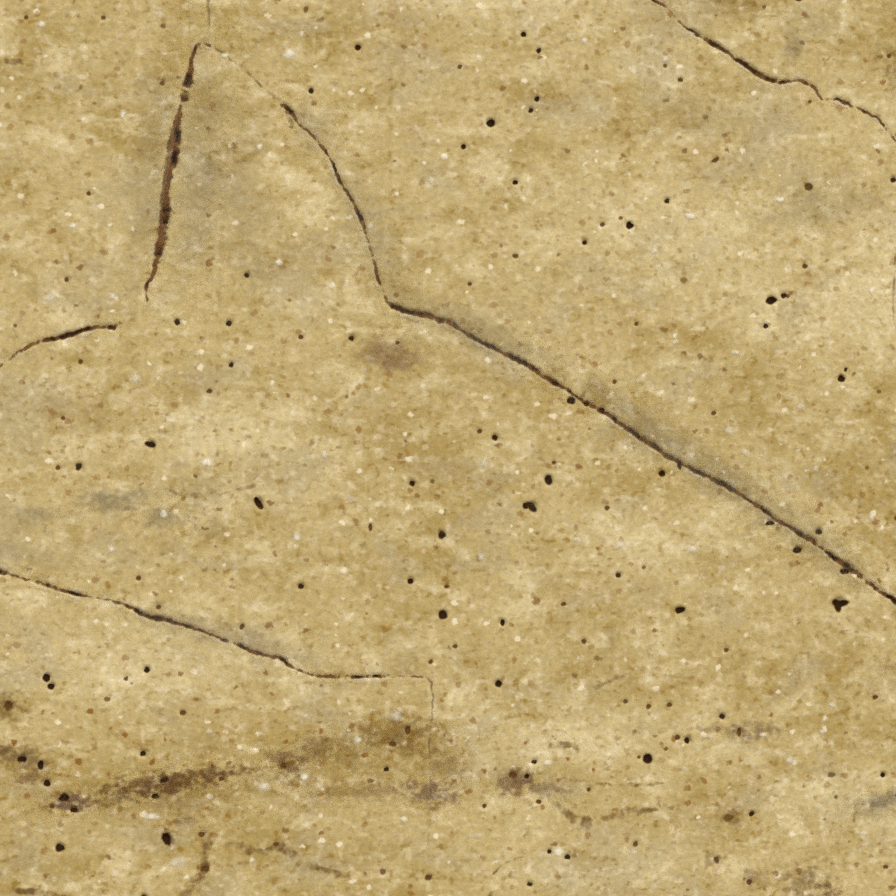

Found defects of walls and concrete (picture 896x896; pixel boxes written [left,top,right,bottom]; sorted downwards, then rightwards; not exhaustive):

crack [652,0,896,141]
crack [144,43,230,300]
crack [0,324,117,367]
crack [281,104,896,604]
crack [0,570,434,707]